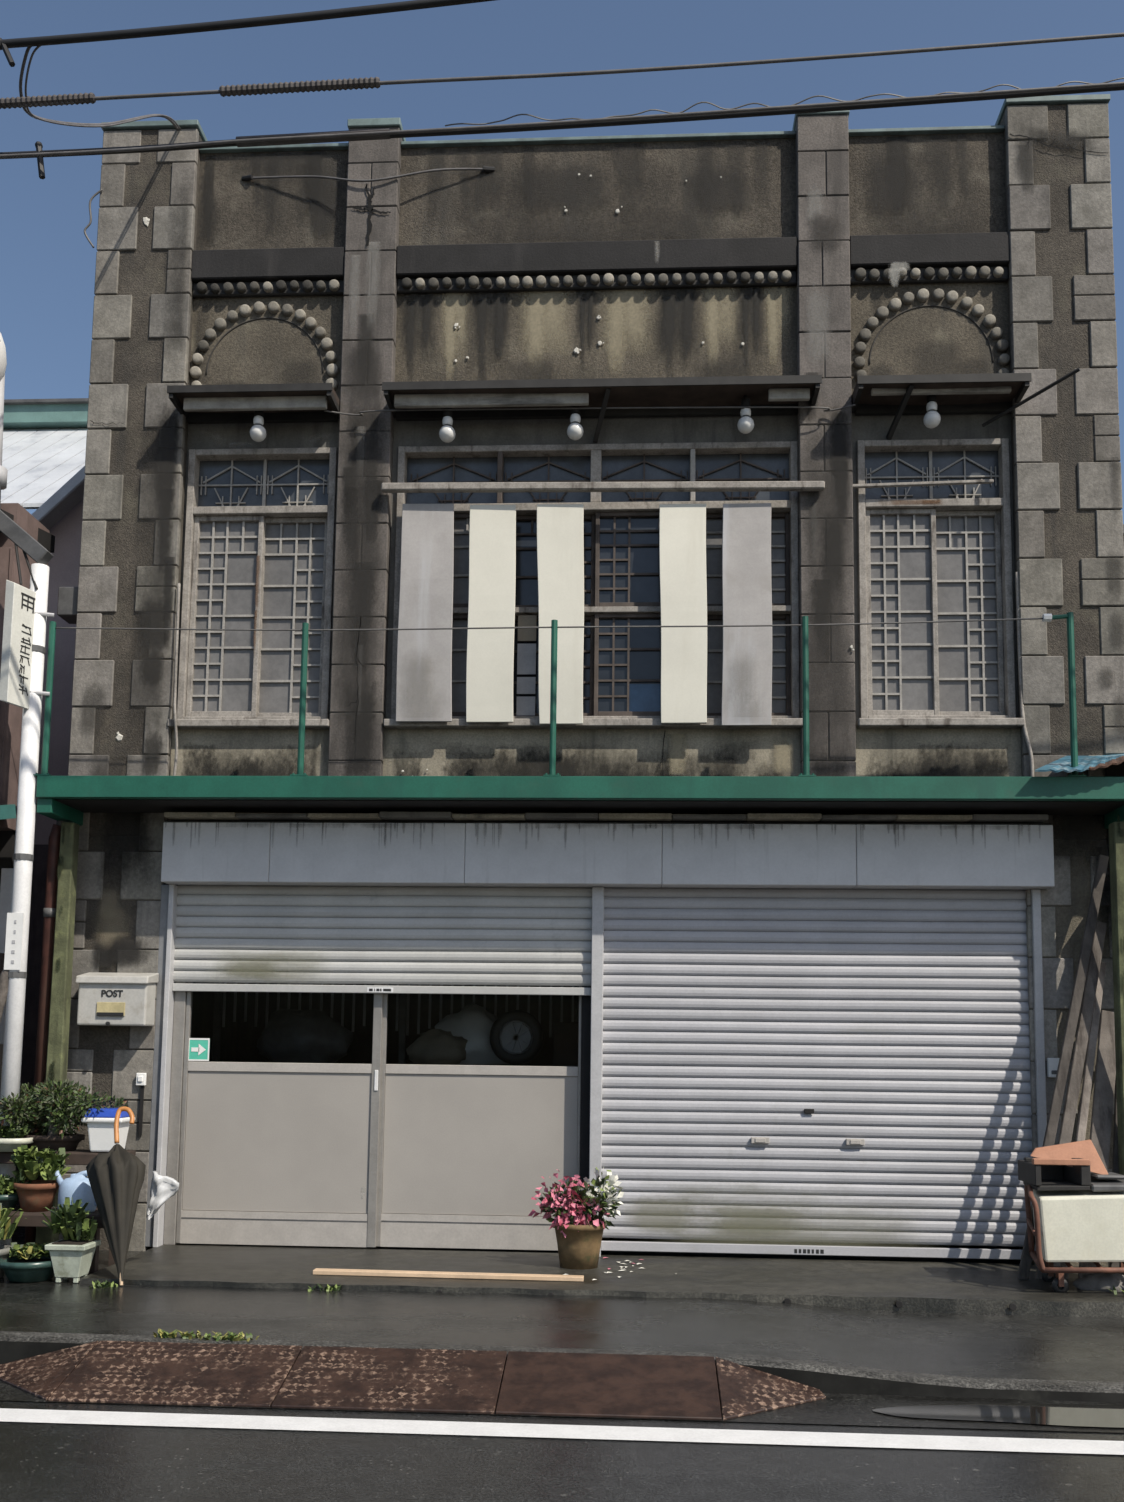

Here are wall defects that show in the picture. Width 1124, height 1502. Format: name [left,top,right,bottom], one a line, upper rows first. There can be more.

damp [475,292,508,377]
damp [527,305,546,364]
damp [578,290,626,368]
damp [660,288,719,360]
damp [739,287,778,361]
damp [342,314,381,776]
damp [186,755,314,776]
damp [450,734,733,776]
damp [885,752,1007,777]